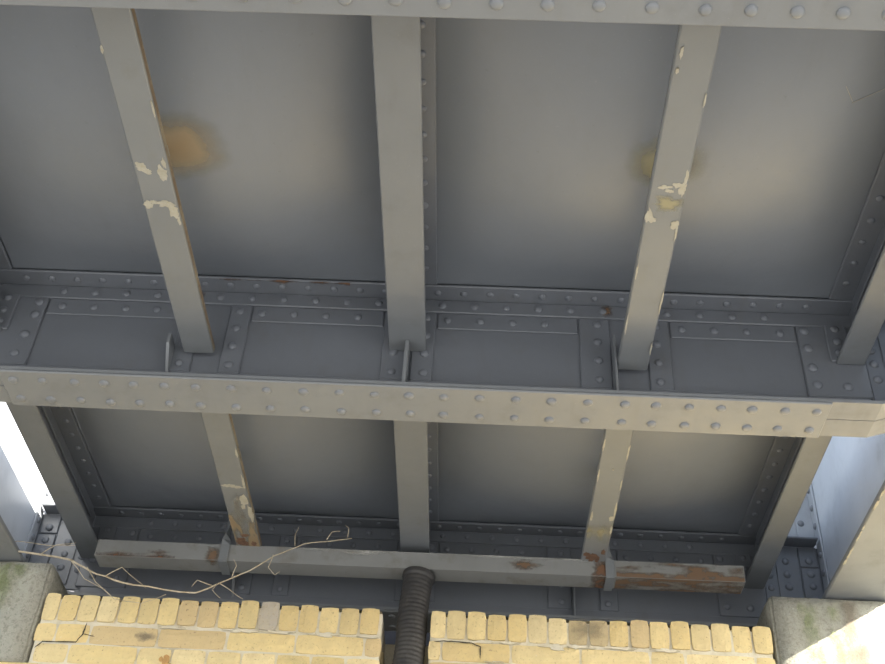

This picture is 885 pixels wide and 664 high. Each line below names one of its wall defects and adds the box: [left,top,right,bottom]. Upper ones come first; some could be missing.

peeling [135,157,168,181]
corrosion [131,9,215,350]
peeling [658,170,689,197]
peeling [143,200,181,225]
peeling [221,475,254,522]
corrosion [591,561,745,594]